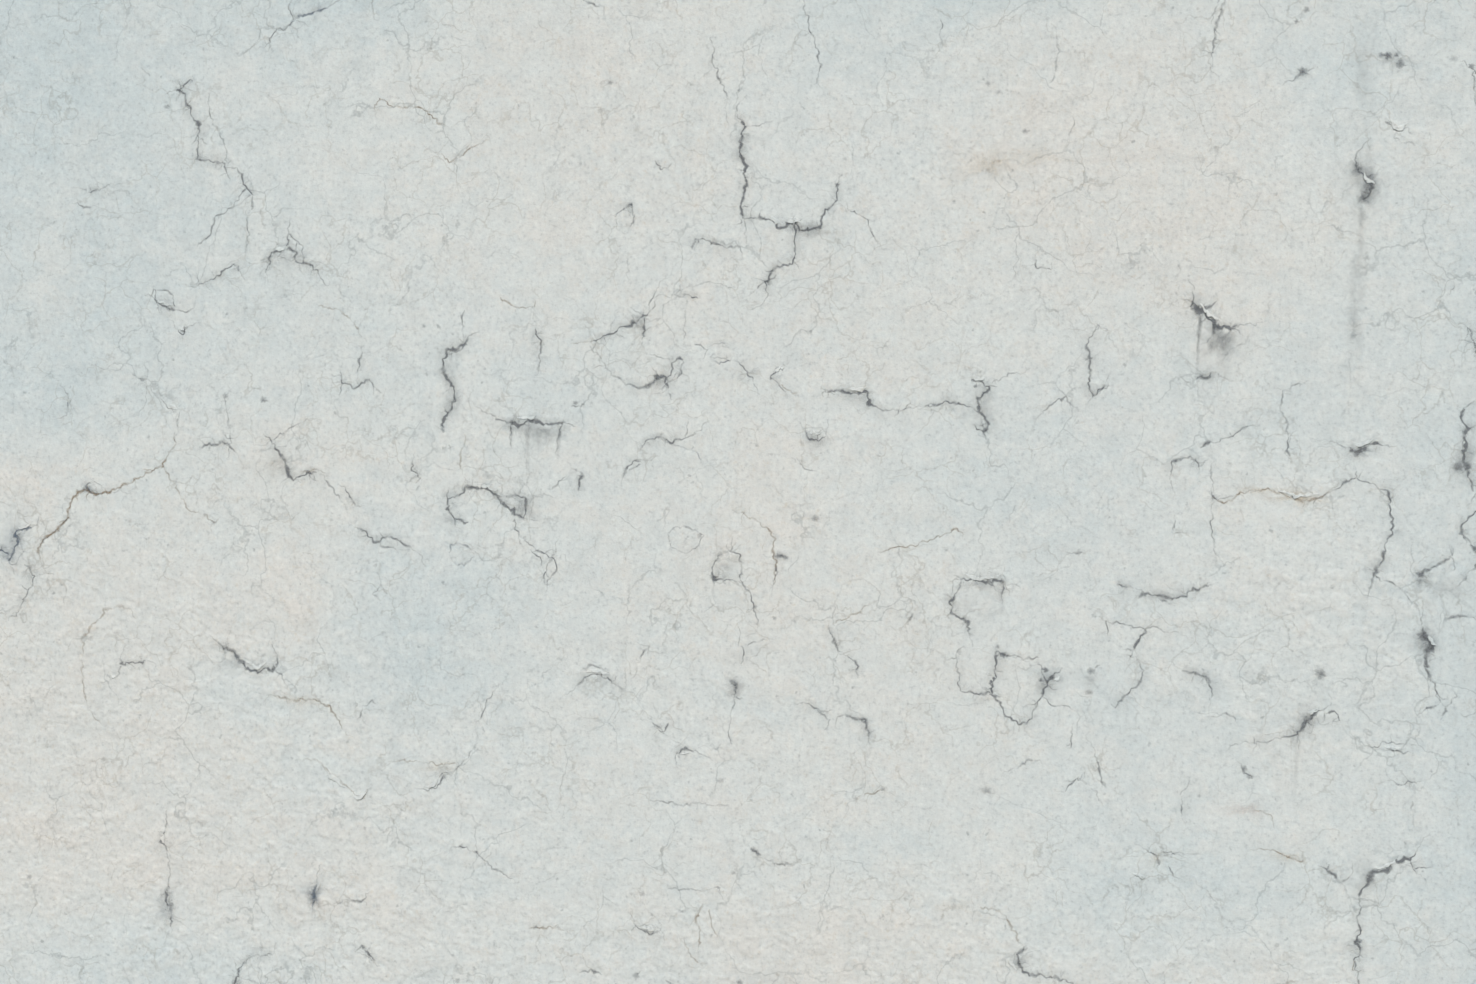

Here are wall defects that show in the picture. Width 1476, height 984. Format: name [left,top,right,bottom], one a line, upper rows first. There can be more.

crack [739,121,872,283]
crack [1,462,164,594]
crack [270,439,311,480]
crack [441,343,465,426]
crack [446,483,526,523]
crack [510,415,563,430]
crack [841,387,873,406]
crack [938,374,990,432]
crack [1373,492,1435,582]
crack [1460,409,1476,550]
crack [949,574,1060,725]
crack [1330,855,1415,966]